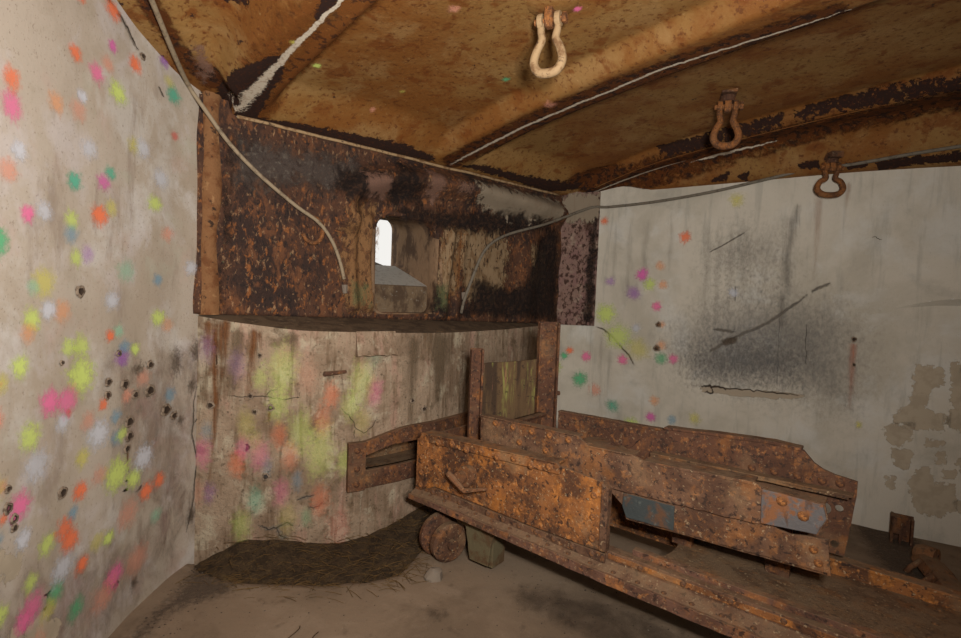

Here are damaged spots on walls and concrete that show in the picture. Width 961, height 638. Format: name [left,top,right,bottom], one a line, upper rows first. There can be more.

peeling [882,361,961,518]